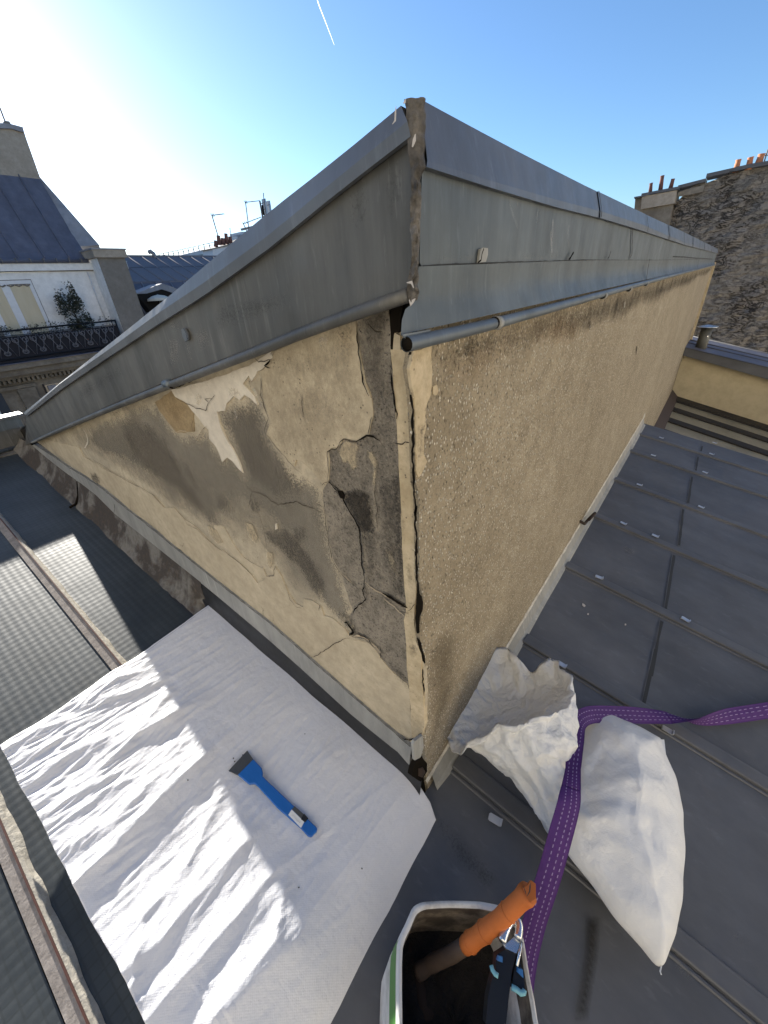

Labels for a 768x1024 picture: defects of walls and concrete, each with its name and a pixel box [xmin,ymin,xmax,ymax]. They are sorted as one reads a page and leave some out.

leakage [92,406,352,626]
spalling [47,310,412,739]
crack [247,305,426,694]